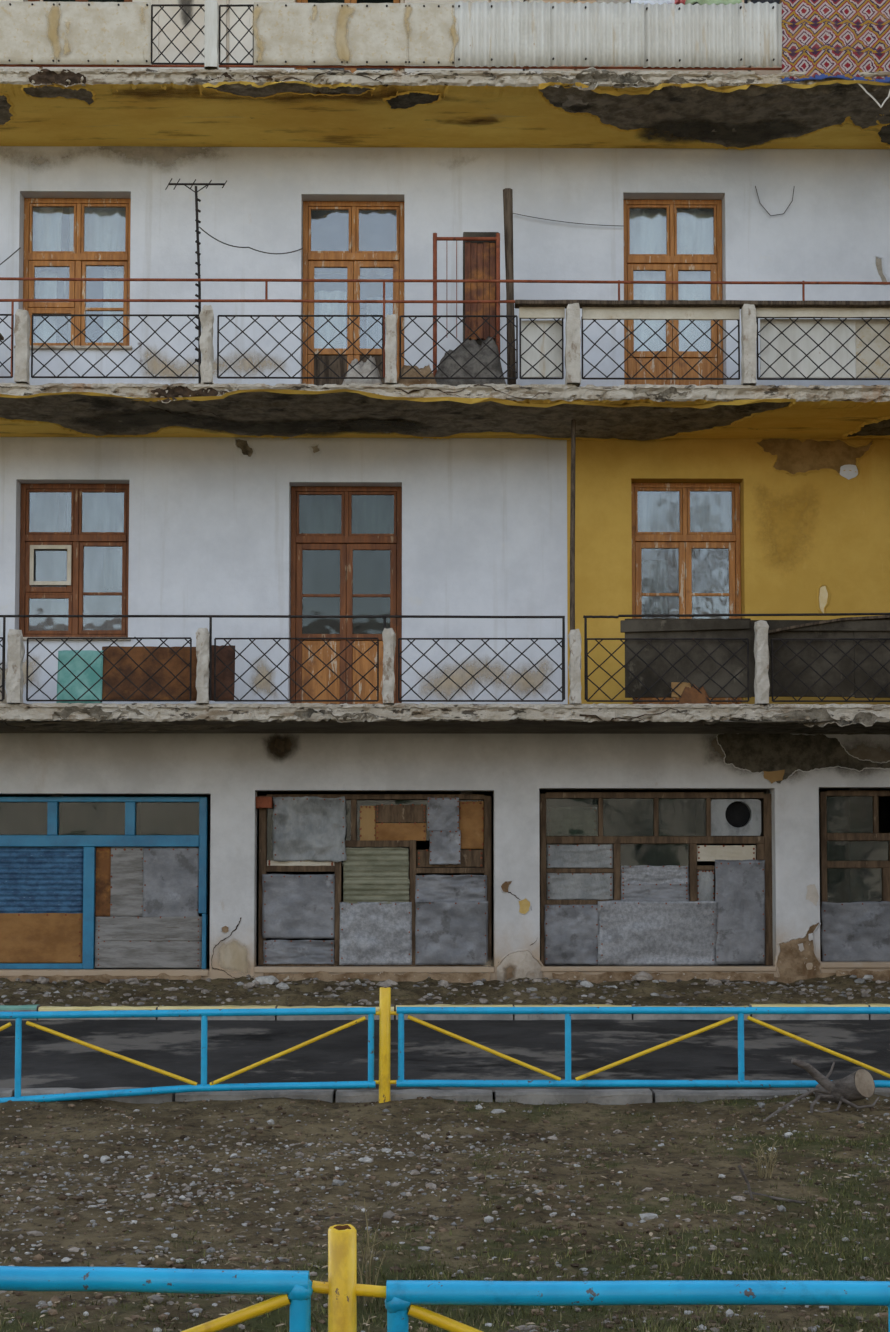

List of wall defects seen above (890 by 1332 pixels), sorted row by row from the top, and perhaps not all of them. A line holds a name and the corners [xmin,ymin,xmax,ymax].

spalling [0,68,97,126]
spalling [533,67,890,150]
spalling [0,385,796,460]
peeling [754,416,890,480]
peeling [701,706,890,784]